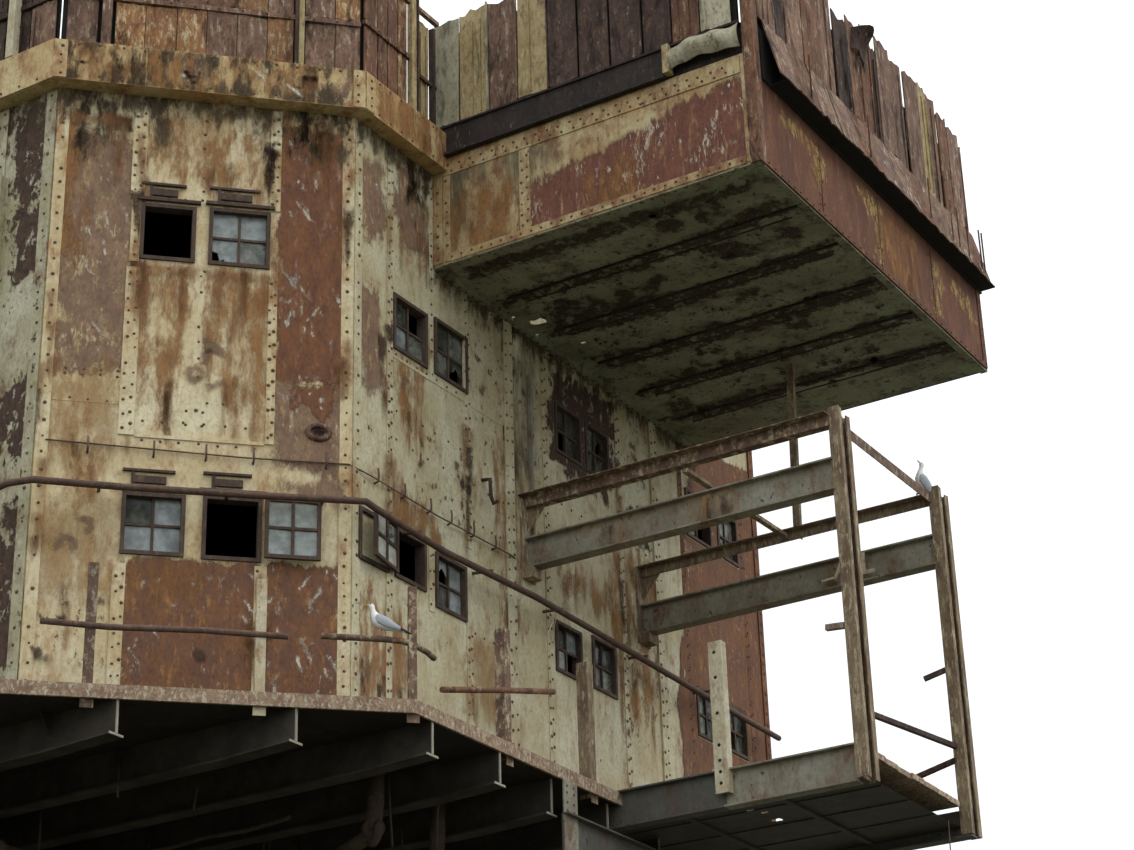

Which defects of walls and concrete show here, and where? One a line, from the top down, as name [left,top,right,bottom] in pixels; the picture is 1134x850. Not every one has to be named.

corrosion [68,45,198,88]
peeling [6,97,55,299]
corrosion [450,75,746,254]
corrosion [36,65,541,635]
corrosion [590,215,922,418]
peeling [0,353,36,468]
peeling [546,370,615,481]
corrosion [31,599,81,661]
corrosion [244,610,271,657]